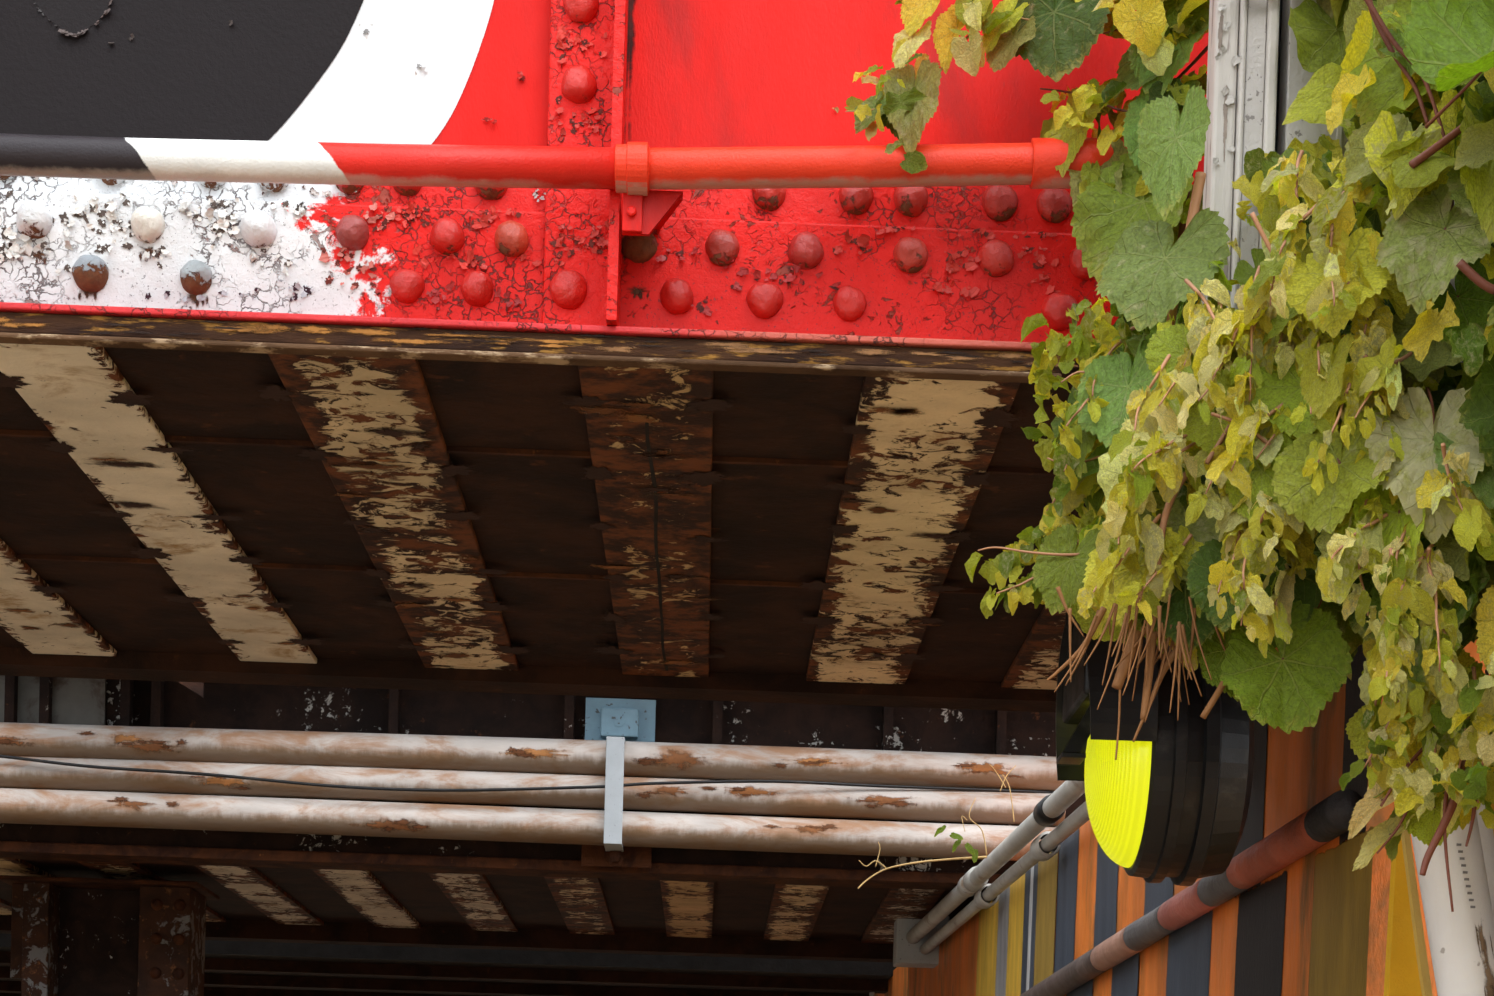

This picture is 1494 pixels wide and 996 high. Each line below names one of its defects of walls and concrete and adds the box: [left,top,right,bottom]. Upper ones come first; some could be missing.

peeling [0,193,172,276]
peeling [129,288,259,302]
peeling [171,181,357,250]
peeling [249,241,389,302]
peeling [363,202,487,311]
peeling [691,258,841,316]
rust [505,747,568,759]
rust [635,750,776,799]
rust [953,762,1024,778]
rust [107,797,179,810]
rust [350,818,430,832]
rust [856,795,914,808]